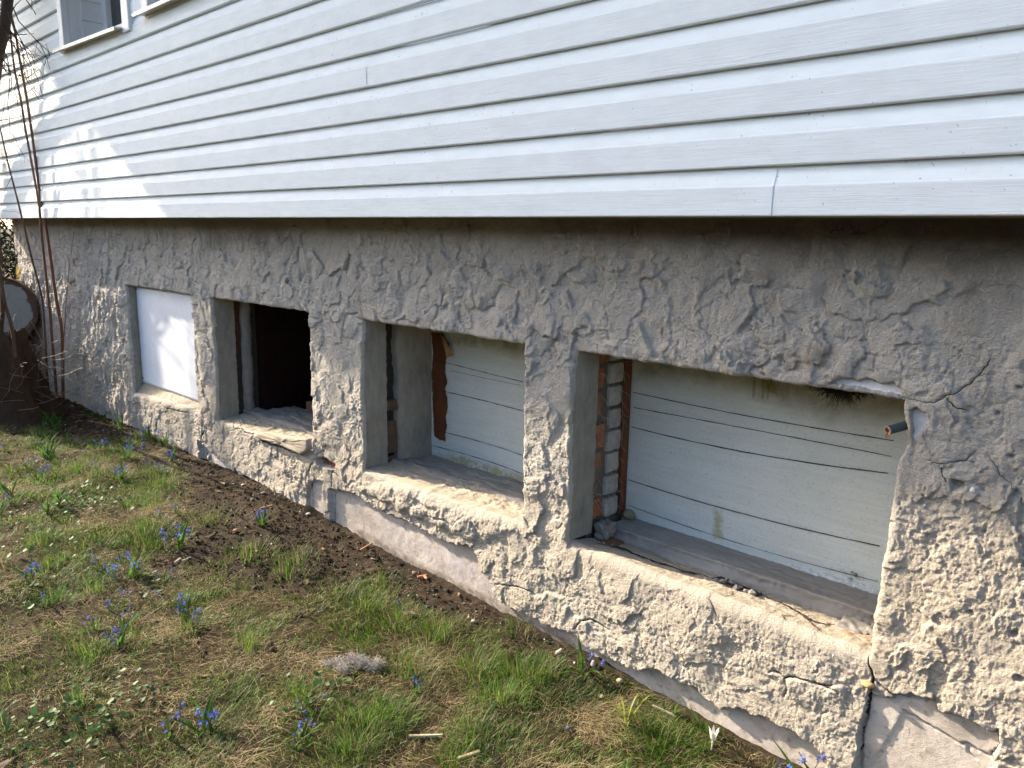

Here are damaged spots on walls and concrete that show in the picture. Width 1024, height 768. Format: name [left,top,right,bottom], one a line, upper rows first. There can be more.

crack [908,358,993,411]
crack [929,453,1017,491]
crack [770,671,833,695]
crack [860,625,963,749]